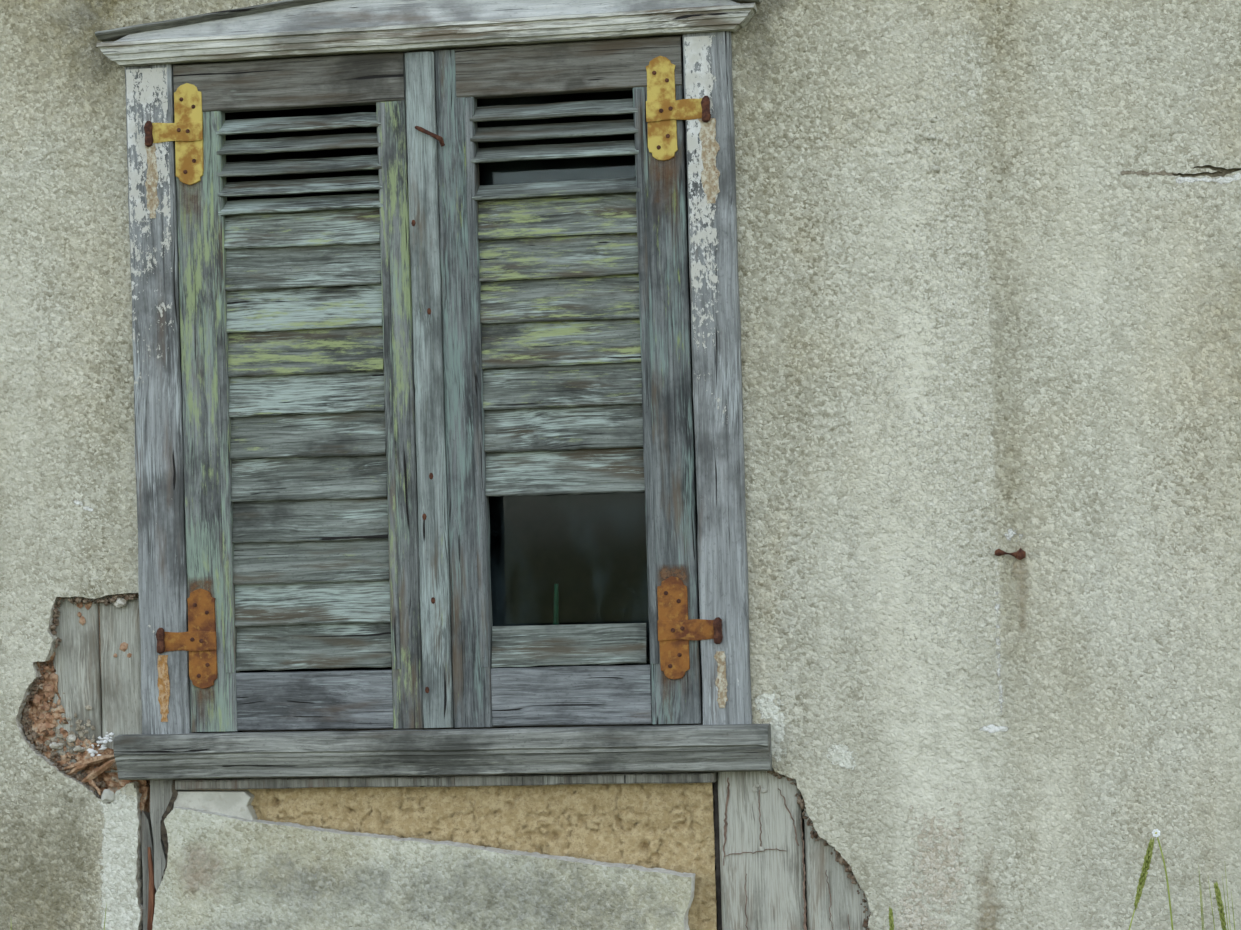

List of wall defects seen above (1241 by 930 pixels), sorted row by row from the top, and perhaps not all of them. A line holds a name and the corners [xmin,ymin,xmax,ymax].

peeling [126,67,174,389]
peeling [684,35,722,355]
crack [1121,165,1241,184]
spalling [16,593,156,930]
crack [134,780,178,930]
spalling [171,691,980,930]